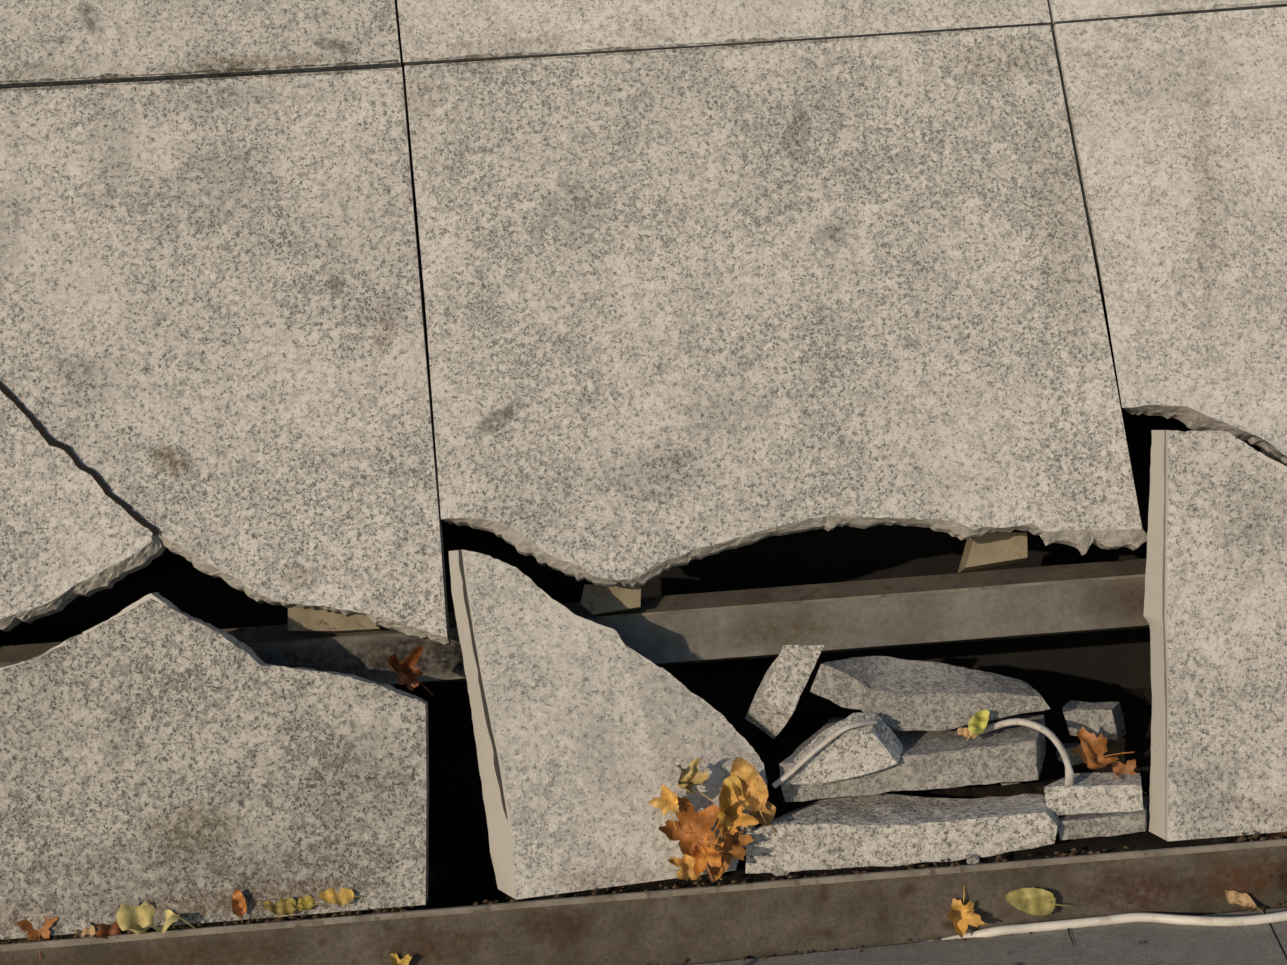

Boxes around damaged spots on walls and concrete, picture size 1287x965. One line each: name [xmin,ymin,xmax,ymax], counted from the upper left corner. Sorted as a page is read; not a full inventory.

crack [0,383,159,536]
spalling [1126,405,1287,459]
spalling [0,533,449,644]
spalling [442,515,1147,585]